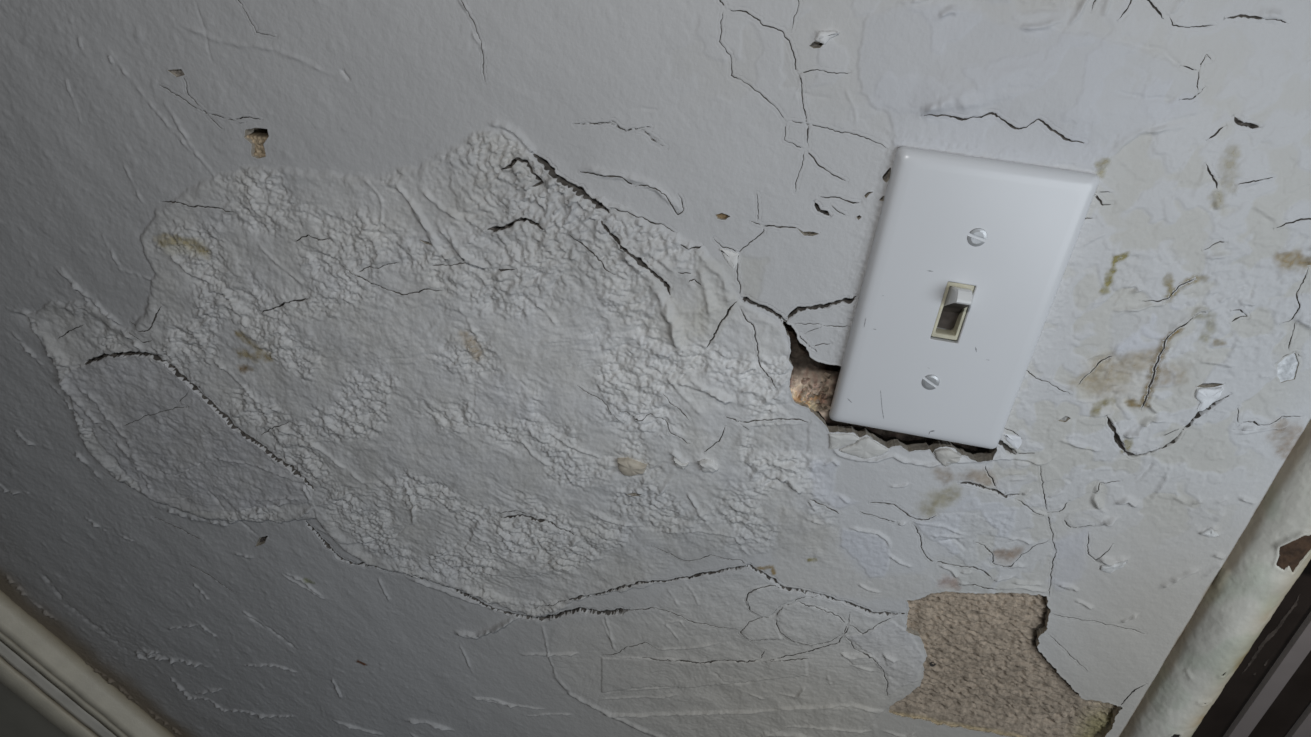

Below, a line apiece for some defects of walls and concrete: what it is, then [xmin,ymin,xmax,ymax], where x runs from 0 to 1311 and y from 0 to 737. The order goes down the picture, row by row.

crack [1088,0,1291,103]
spalling [242,125,271,161]
crack [921,109,1089,147]
crack [1201,114,1276,192]
crack [485,0,889,454]
peeling [714,211,732,222]
spalling [796,227,821,239]
leakage [1101,254,1127,291]
crack [807,238,1311,673]
crack [55,303,906,696]
peeling [1276,535,1311,572]
spalling [887,589,1124,737]